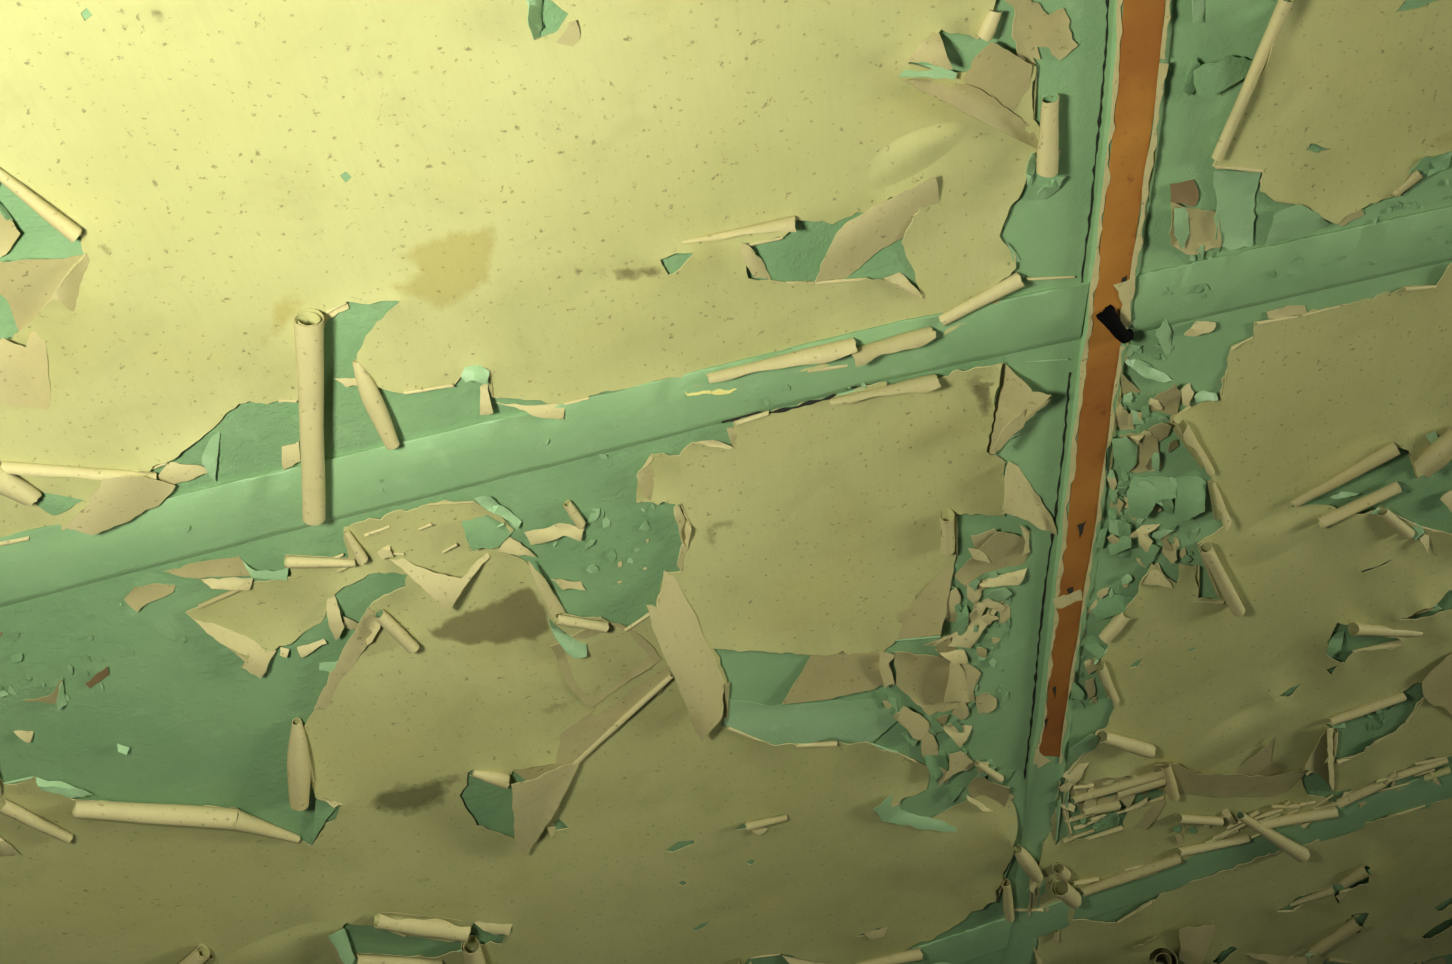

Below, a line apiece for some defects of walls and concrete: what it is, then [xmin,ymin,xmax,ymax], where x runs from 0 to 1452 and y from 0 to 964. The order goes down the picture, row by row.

peeling [0,168,90,410]
peeling [661,176,940,299]
peeling [898,0,1452,908]
peeling [0,302,1082,964]
peeling [1092,896,1158,923]
peeling [1133,866,1372,964]
peeling [1419,898,1452,939]